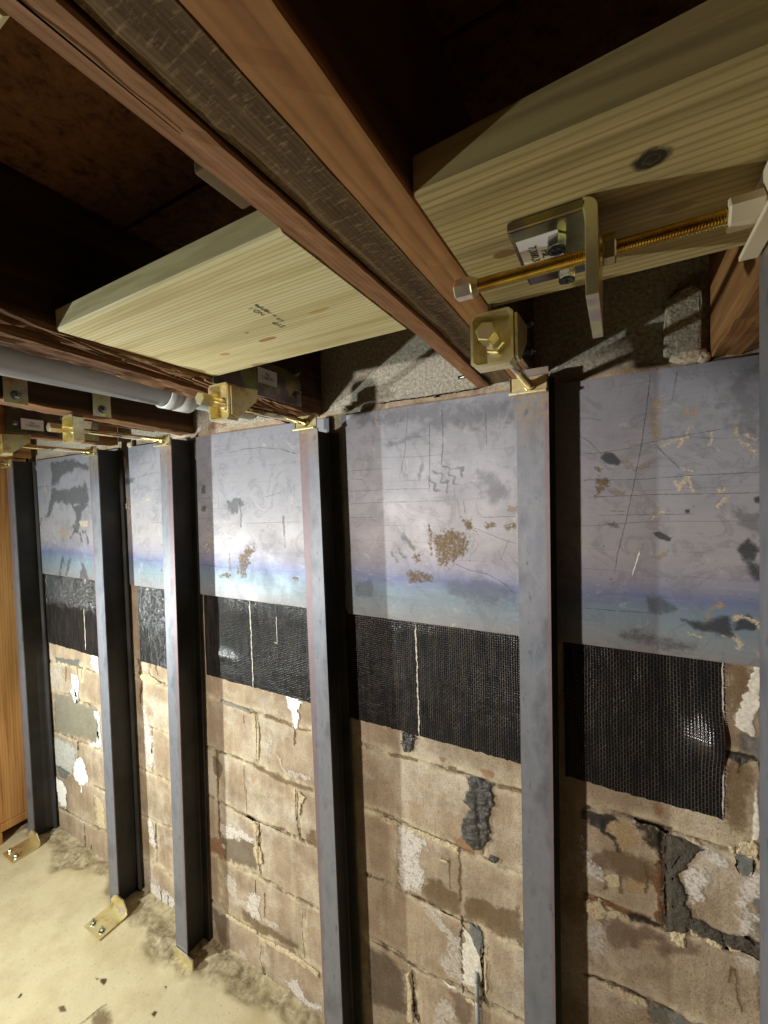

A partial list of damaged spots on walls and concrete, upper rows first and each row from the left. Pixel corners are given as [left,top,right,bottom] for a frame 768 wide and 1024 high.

rust [594,467,608,497]
rust [219,543,256,578]
rust [406,519,516,583]
water stain [138,659,156,769]
peeling [735,667,760,737]
peeling [55,757,88,810]
water stain [147,820,157,847]
water stain [213,754,297,948]
crack [234,789,306,871]
spalling [728,790,760,861]
crack [410,894,489,1007]
spalling [670,930,742,953]